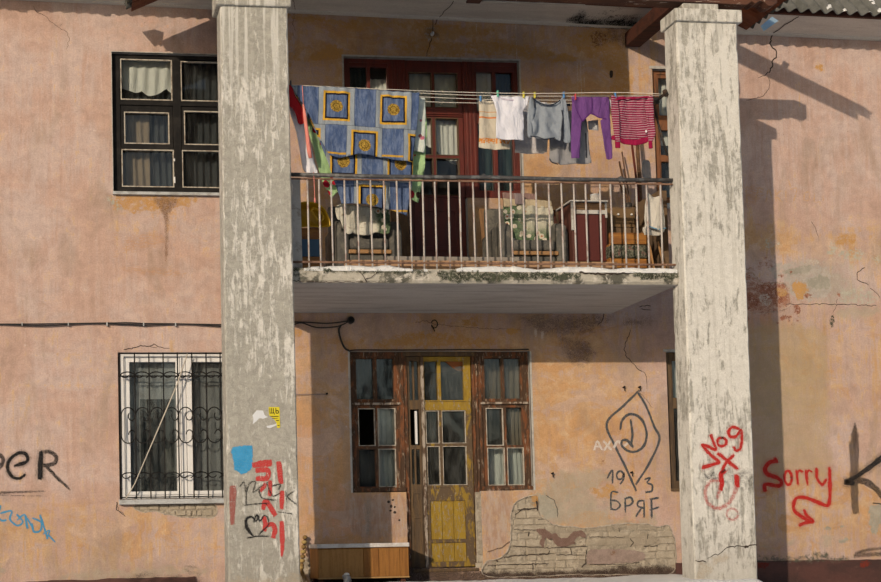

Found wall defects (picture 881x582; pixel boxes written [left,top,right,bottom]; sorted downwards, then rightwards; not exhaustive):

crack [750,16,799,100]
water stain [104,195,198,276]
flaking render [746,257,812,325]
crack [786,267,880,312]
flaking render [475,486,677,578]